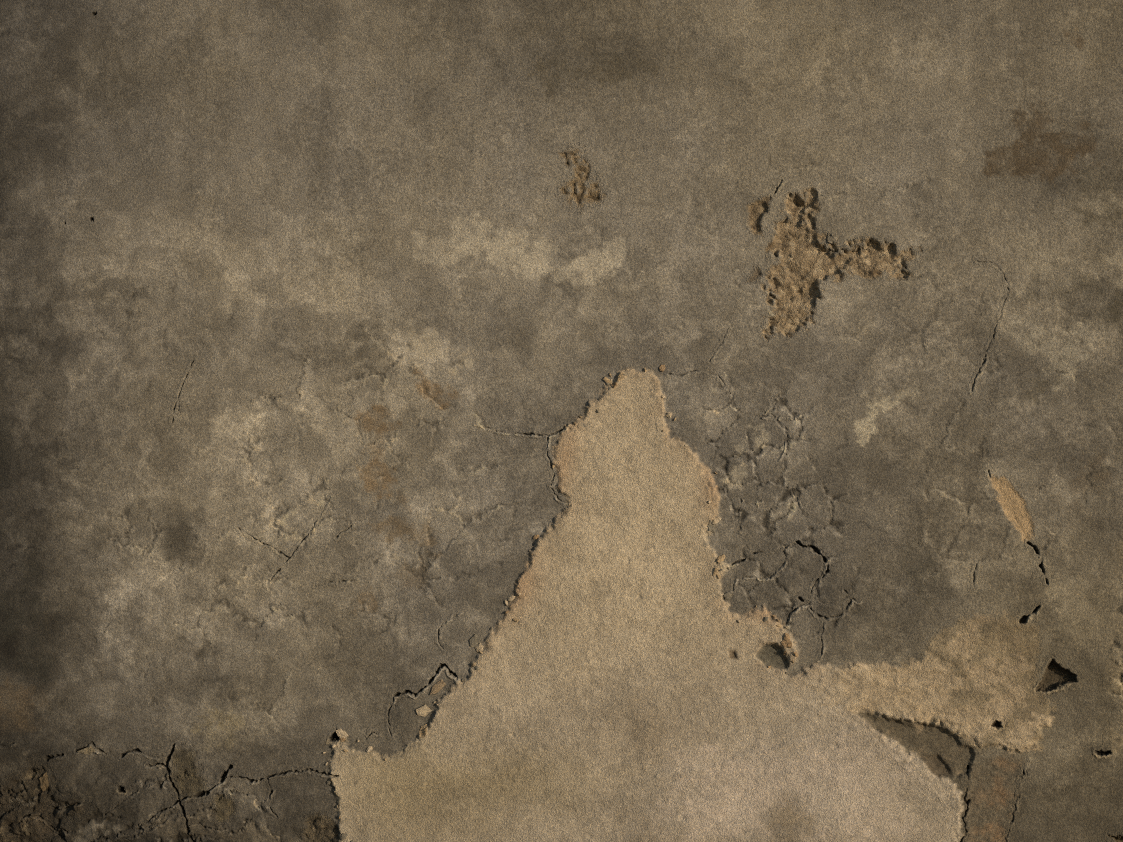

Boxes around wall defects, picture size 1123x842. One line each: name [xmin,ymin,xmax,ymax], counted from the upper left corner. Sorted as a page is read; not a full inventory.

crack [40,314,571,842]
spalling [554,142,608,214]
peeling [296,365,1064,842]
spalling [745,181,925,342]
crack [626,120,1123,665]
peeling [1098,527,1123,760]